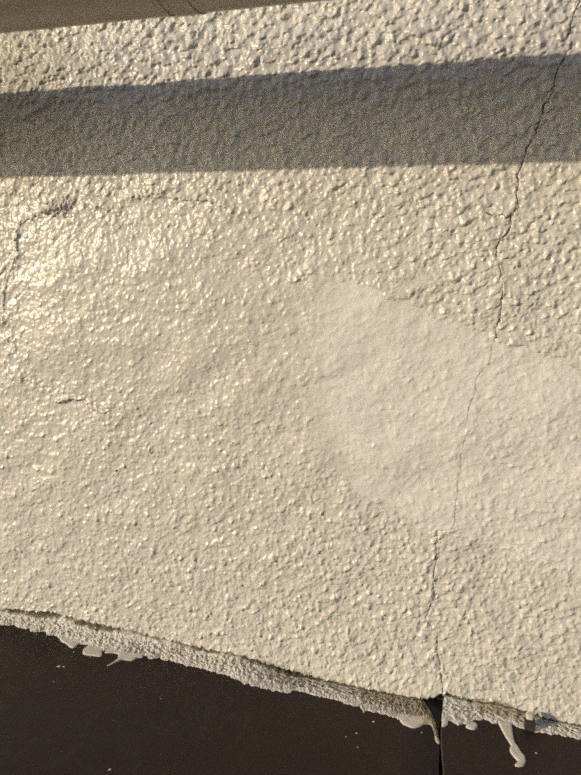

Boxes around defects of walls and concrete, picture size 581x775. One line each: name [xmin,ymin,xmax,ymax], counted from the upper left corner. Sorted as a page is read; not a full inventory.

crack [425,0,580,692]